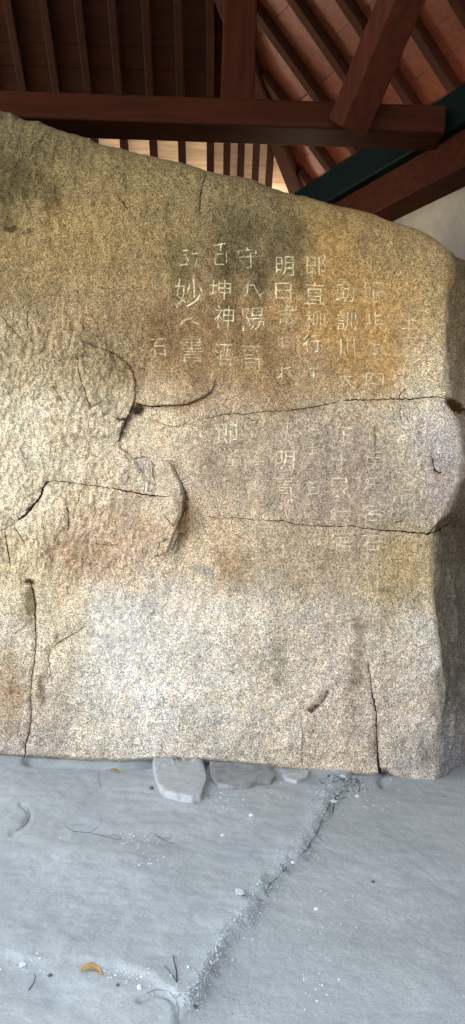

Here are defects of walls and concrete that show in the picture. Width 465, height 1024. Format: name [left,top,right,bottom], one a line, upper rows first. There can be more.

crack [0,343,465,757]
crack [267,643,382,890]